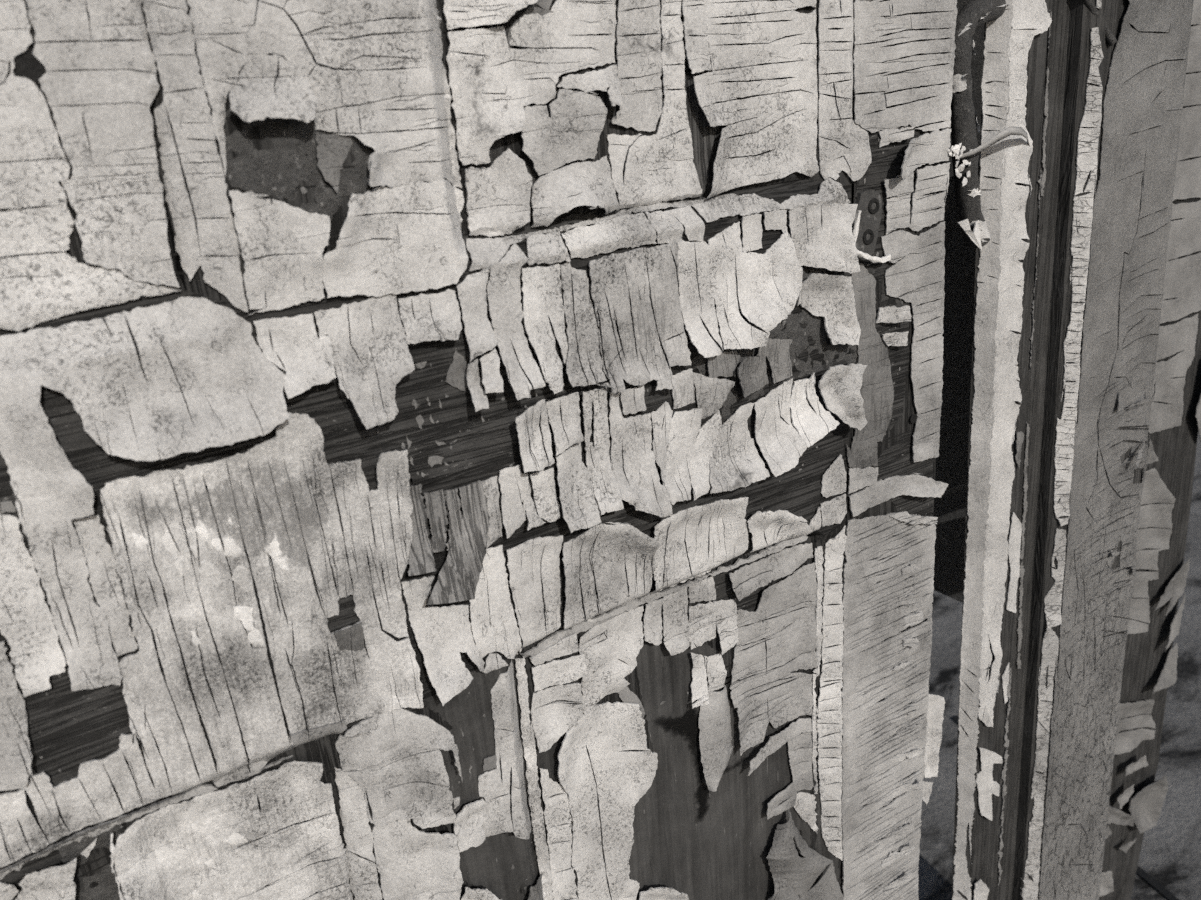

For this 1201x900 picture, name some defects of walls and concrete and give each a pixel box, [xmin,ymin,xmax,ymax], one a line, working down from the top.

peeling [14,46,49,84]
crack [0,0,950,278]
crack [95,315,216,446]
peeling [0,54,951,900]
crack [535,320,559,363]
crack [863,242,939,468]
peeling [1020,9,1104,900]
peeling [1105,0,1201,853]
crack [0,789,69,860]
crack [688,614,866,817]
peeling [973,422,1030,900]
peeling [1099,871,1114,897]